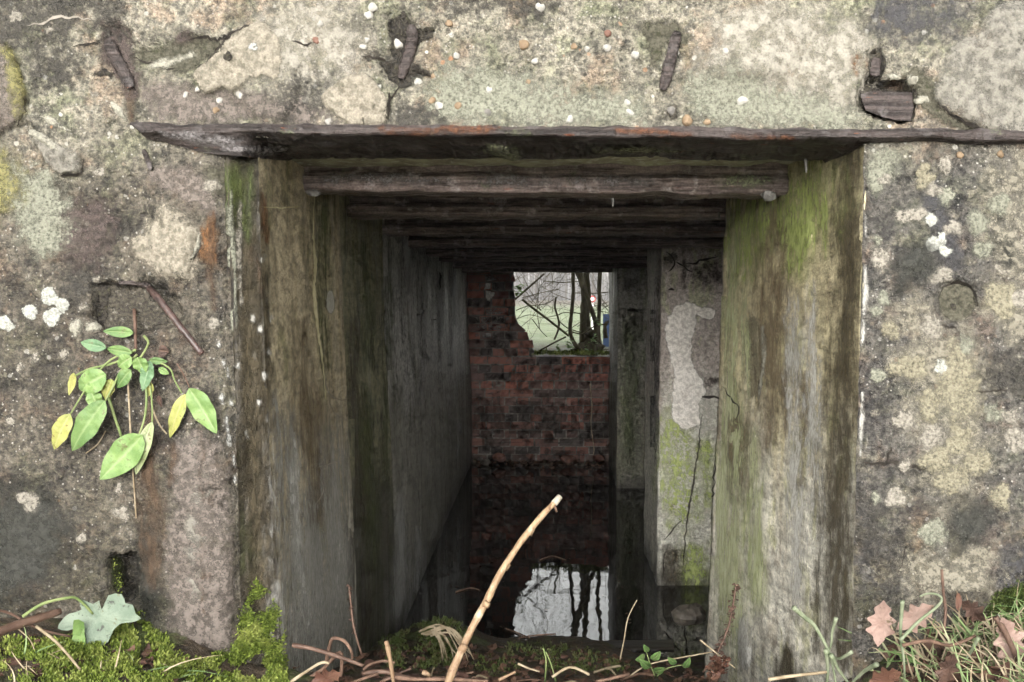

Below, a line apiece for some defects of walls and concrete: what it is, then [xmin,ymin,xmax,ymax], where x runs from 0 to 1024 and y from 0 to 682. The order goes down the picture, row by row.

rust [198,212,216,308]
water stain [219,191,369,674]
peeling [665,302,719,429]
crack [663,386,739,580]
water stain [728,419,749,487]
water stain [757,147,1024,669]
water stain [774,646,797,682]